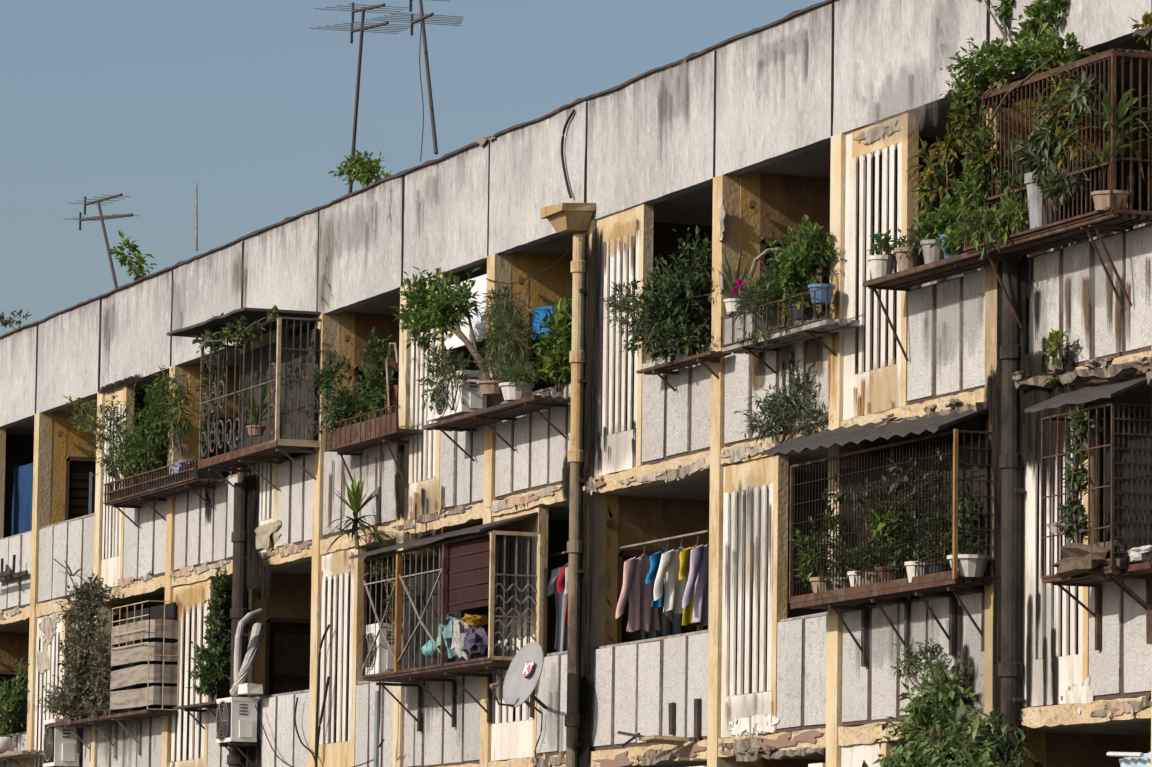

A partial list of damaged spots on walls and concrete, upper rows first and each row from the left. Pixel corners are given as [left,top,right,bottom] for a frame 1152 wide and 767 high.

spalling [593,714,823,767]